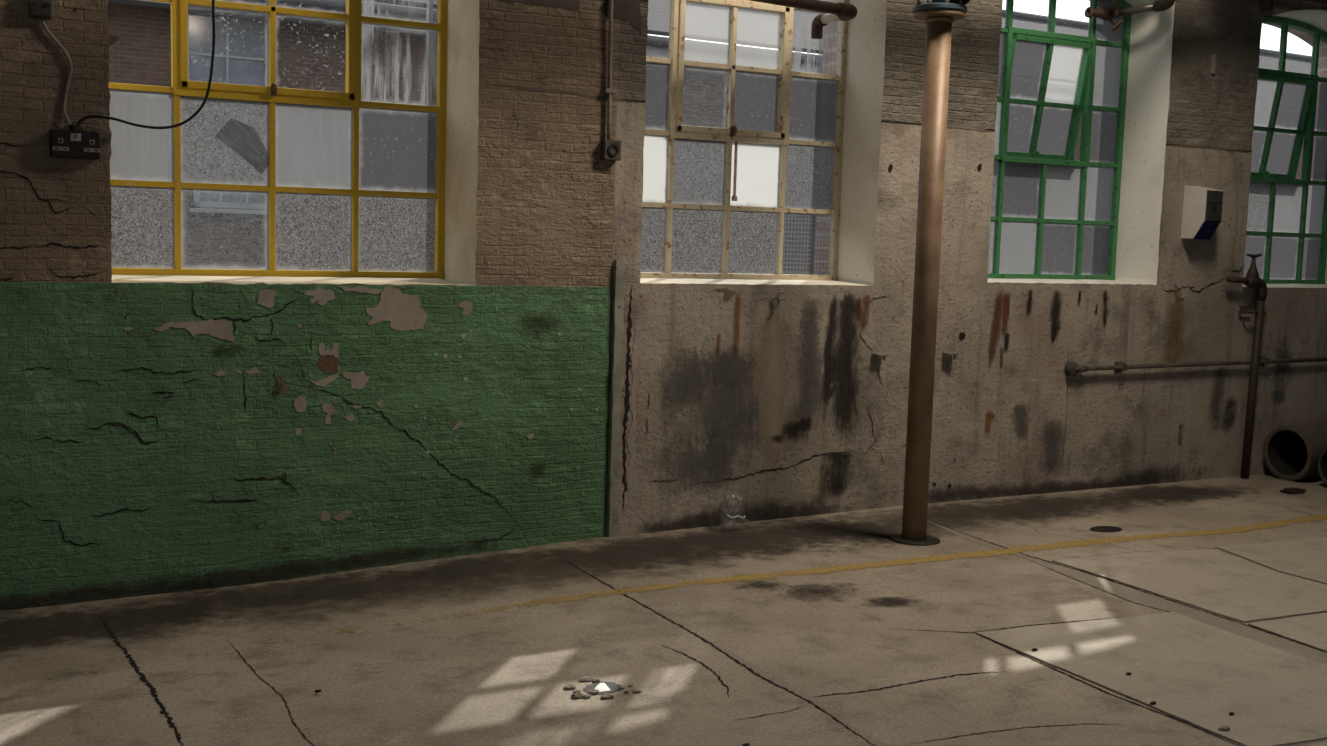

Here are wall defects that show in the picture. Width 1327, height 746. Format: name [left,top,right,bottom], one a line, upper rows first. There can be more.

peeling [600,0,642,33]
crack [0,367,201,459]
peeling [154,319,234,342]
peeling [279,324,382,456]
crack [188,286,524,543]
peeling [304,286,440,334]
water stain [775,294,858,442]
rust [990,293,1010,367]
water stain [645,452,850,533]
water stain [0,542,485,611]
crack [97,614,184,746]
crack [227,640,314,746]